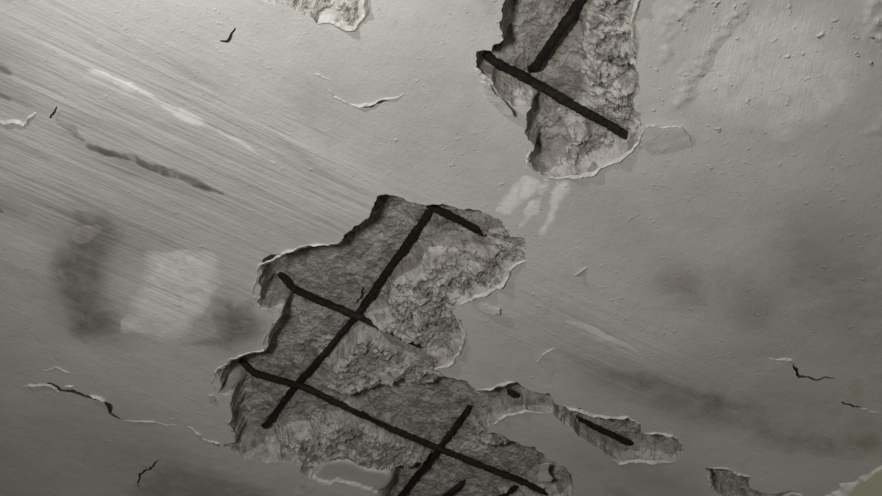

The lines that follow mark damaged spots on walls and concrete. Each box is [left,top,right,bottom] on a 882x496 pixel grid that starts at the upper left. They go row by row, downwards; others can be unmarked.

spalling [261,0,370,32]
spalling [474,0,692,179]
peeling [0,112,37,126]
spalling [208,194,684,496]
crack [769,358,834,381]
crack [21,366,220,446]
spalling [706,467,804,496]